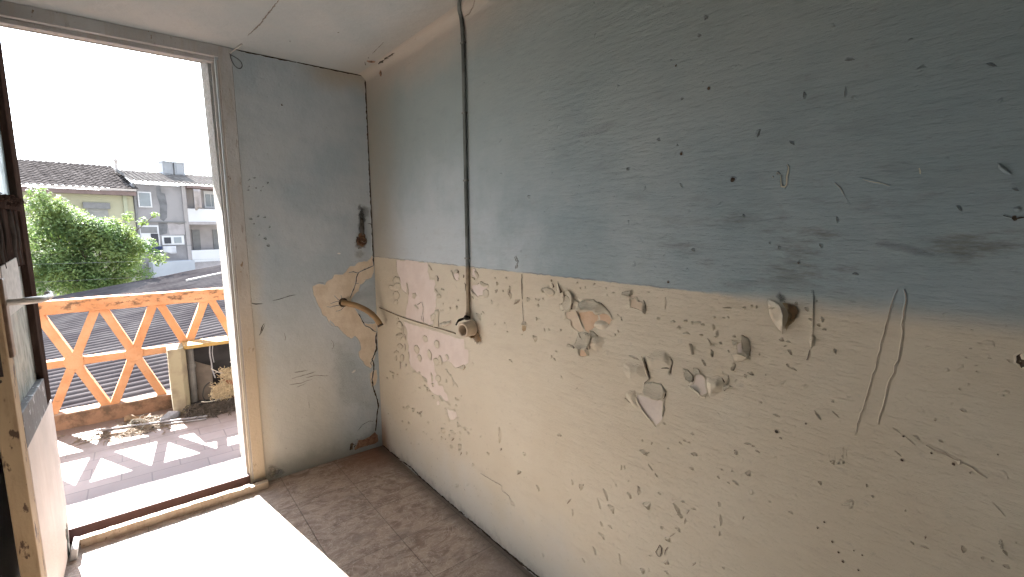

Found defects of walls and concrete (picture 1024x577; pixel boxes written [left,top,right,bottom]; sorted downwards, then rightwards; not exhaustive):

peeling [311,254,646,466]
peeling [682,338,714,399]
peeling [721,335,766,391]
peeling [767,299,826,371]
peeling [635,382,667,428]